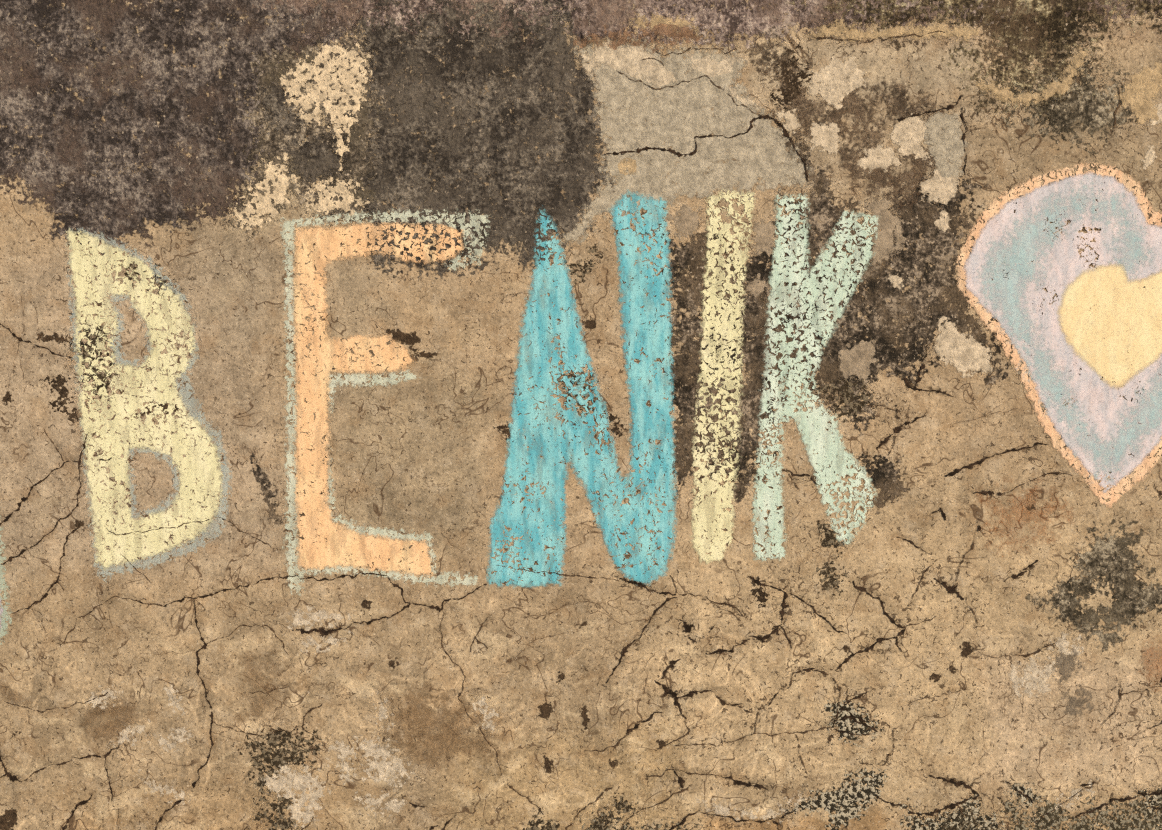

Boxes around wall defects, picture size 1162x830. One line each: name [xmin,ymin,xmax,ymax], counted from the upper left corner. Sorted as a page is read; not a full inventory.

leakage [0,0,615,285]
crack [605,47,809,182]
leakage [111,259,185,301]
crack [0,429,1073,830]
leakage [1026,519,1162,715]
crack [1103,680,1162,743]
crack [875,775,1162,823]